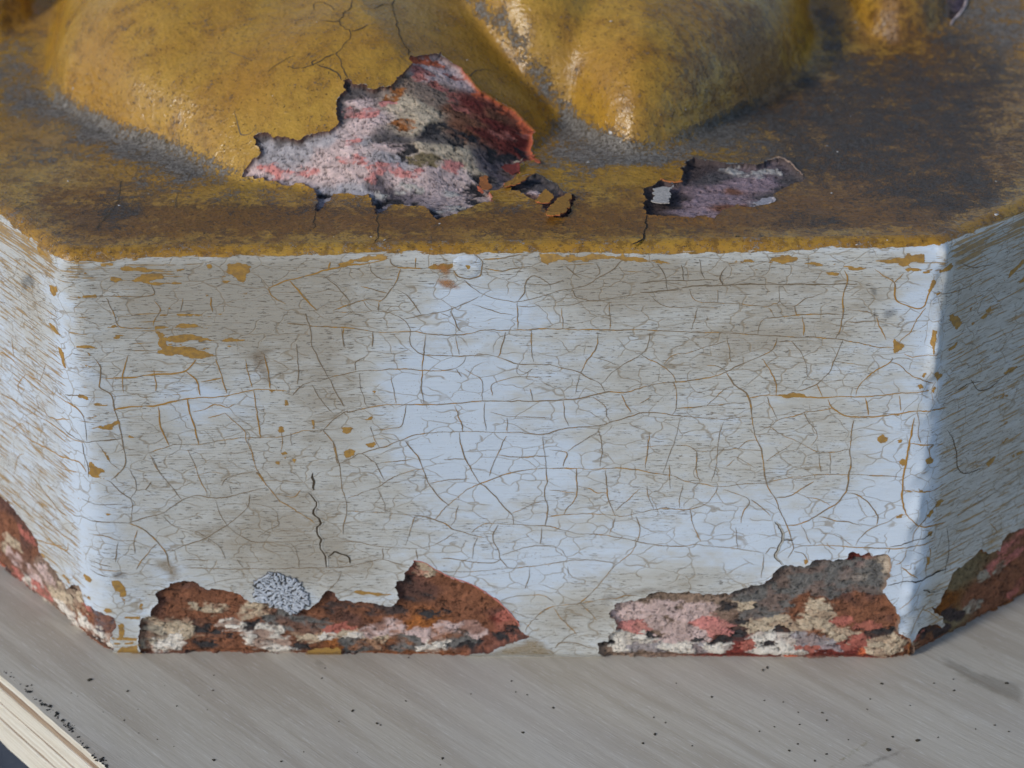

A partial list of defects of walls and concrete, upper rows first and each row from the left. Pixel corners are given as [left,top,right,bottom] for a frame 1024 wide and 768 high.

crack [228,0,409,79]
peeling [242,52,578,224]
peeling [643,156,805,218]
crack [0,210,1023,648]
peeling [0,496,116,651]
peeling [138,560,529,656]
peeling [597,528,1024,659]